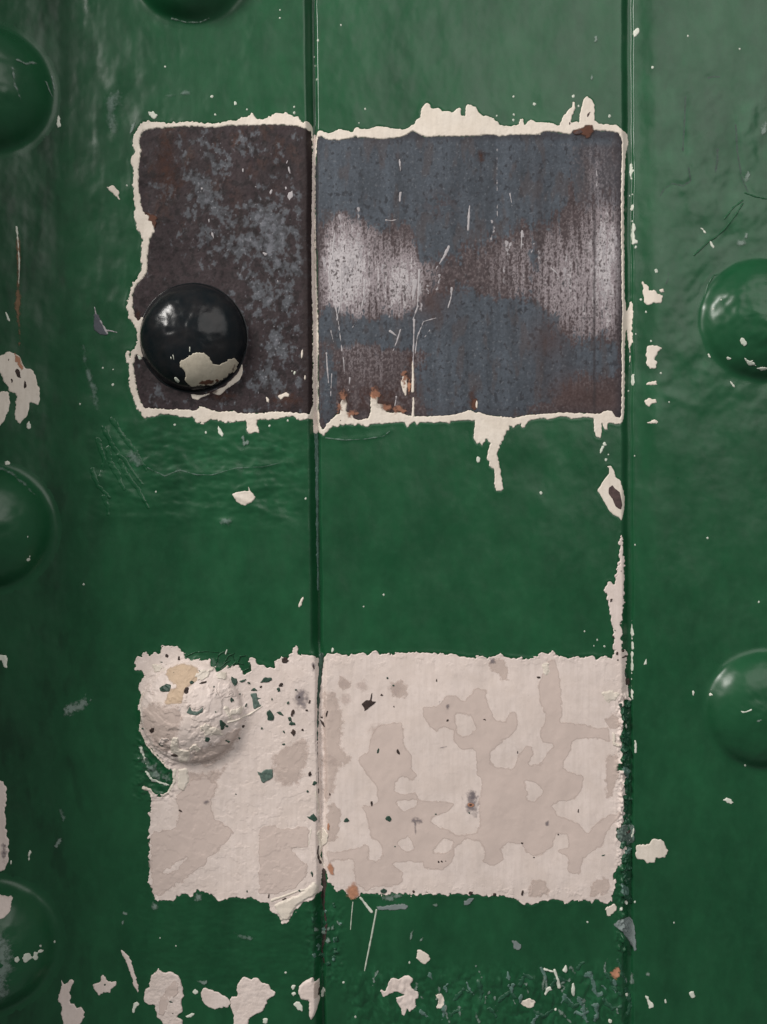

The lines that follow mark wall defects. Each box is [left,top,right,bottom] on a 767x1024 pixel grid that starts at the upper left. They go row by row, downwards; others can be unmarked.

peeling [107,95,664,590]
peeling [0,352,40,429]
peeling [134,535,668,966]
peeling [0,781,12,871]
peeling [58,979,85,1024]
peeling [93,975,116,995]
peeling [121,950,275,1024]
peeling [291,977,325,1019]
peeling [373,950,634,1024]